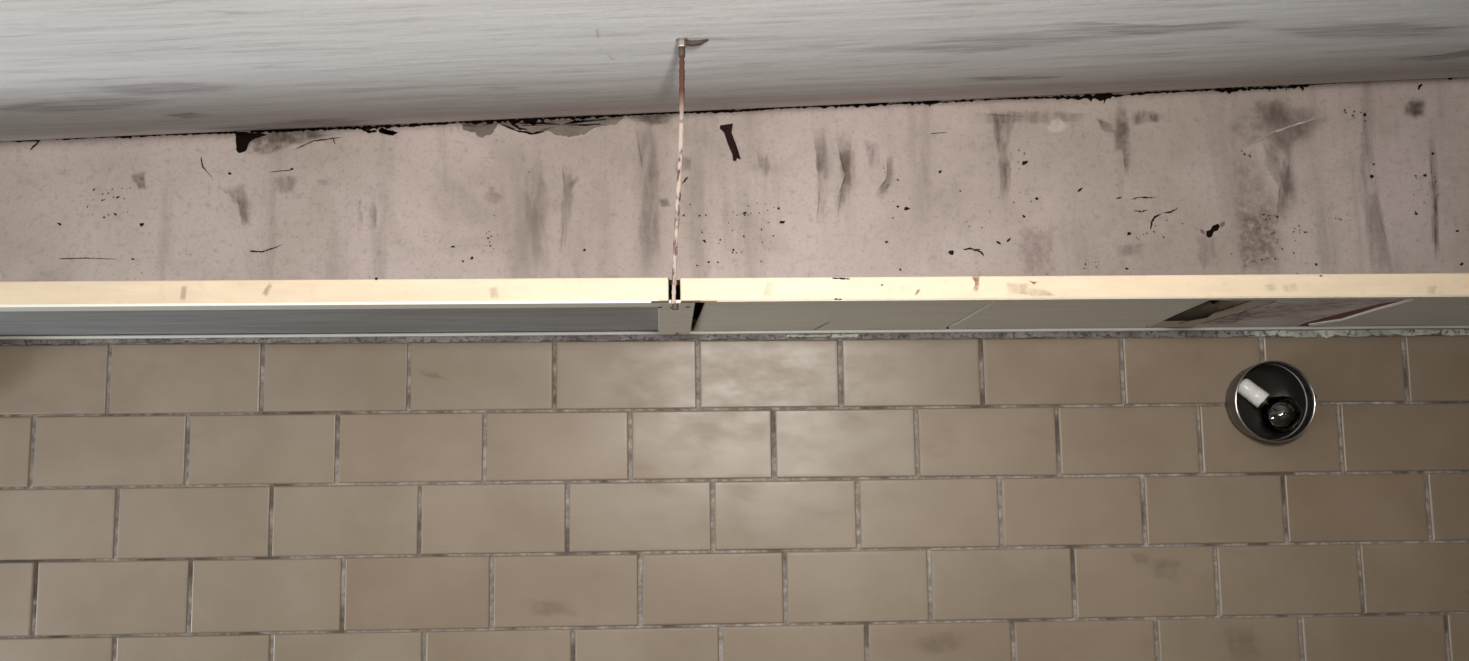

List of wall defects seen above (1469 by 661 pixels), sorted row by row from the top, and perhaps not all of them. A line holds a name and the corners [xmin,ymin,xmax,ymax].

flaking render [456,116,624,139]
flaking render [235,132,342,153]